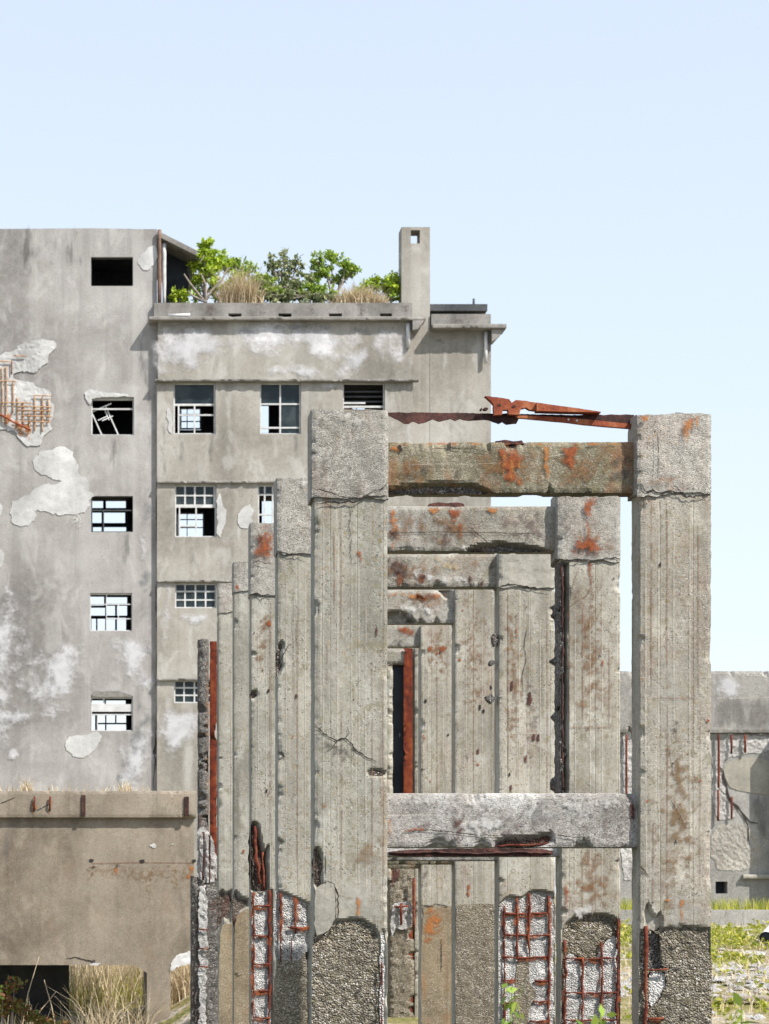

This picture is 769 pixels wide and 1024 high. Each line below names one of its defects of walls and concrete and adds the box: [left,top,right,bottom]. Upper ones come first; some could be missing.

efflorescence [157,329,218,368]
damp [241,322,402,387]
spalling [0,339,94,528]
corrosion [484,440,549,485]
corrosion [572,497,612,584]
peeling [65,732,102,758]
crack [315,725,374,761]
crack [720,767,758,843]
spalling [170,824,621,1024]
spalling [638,908,712,1024]